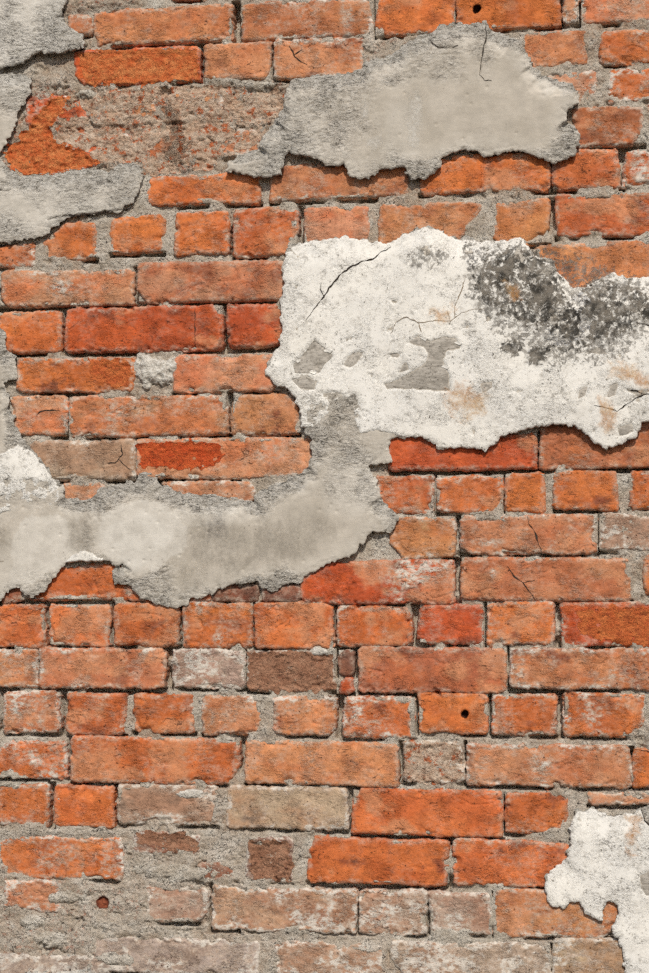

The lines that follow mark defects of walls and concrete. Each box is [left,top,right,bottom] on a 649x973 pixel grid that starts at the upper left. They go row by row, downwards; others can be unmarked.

crack [479,27,492,81]
peeling [0,0,581,244]
crack [306,247,390,320]
leakage [459,241,649,372]
peeling [0,225,649,609]
spalling [247,649,337,697]
spalling [576,603,649,648]
peeling [544,805,649,973]